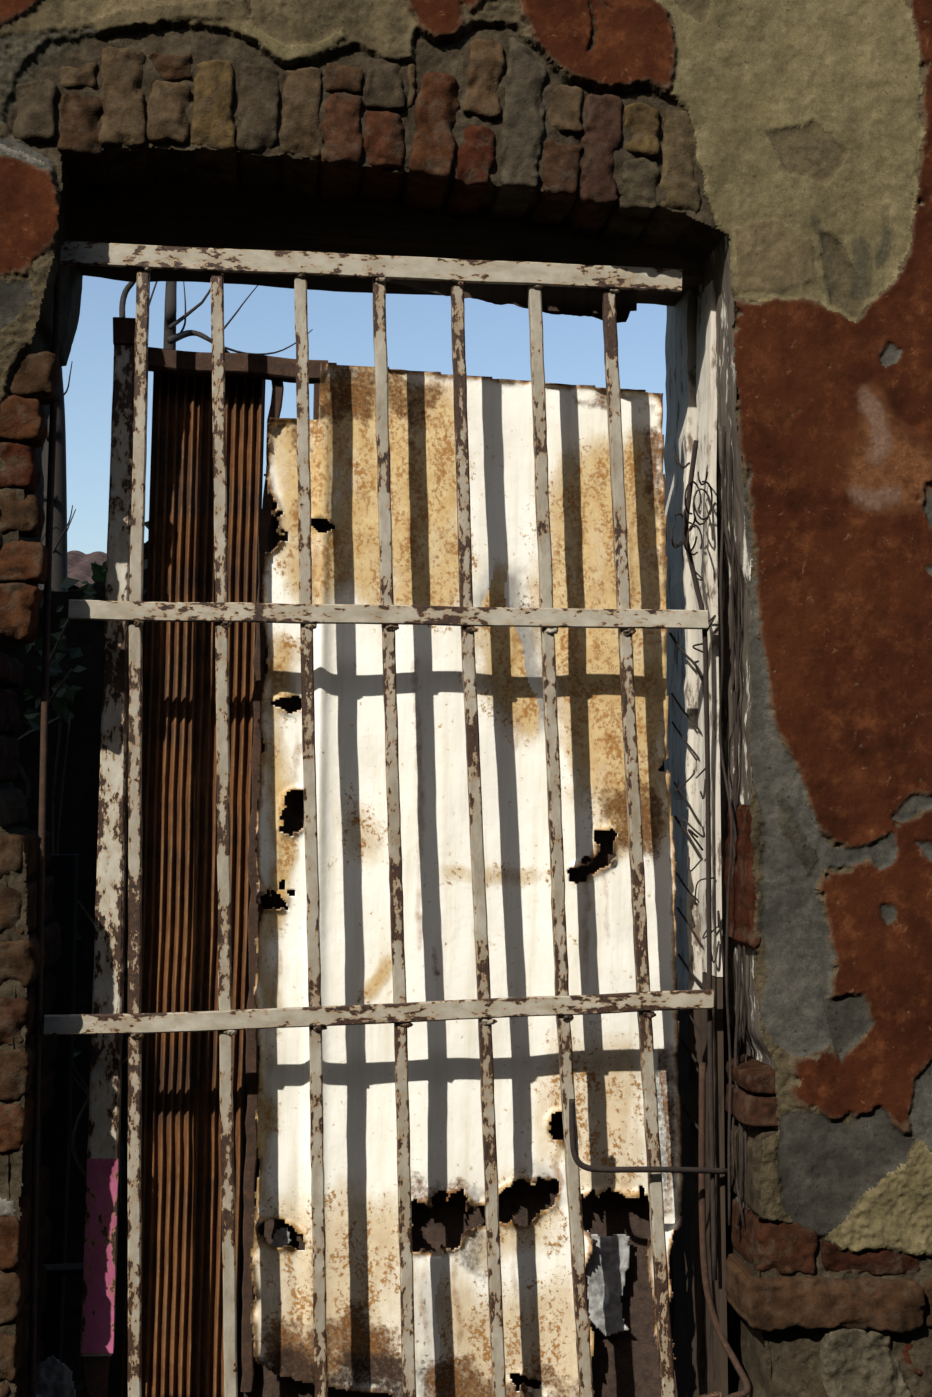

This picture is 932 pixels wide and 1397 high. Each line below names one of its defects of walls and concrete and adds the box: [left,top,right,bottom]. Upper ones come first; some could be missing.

spalling [0,0,926,323]
rust [271,367,477,606]
rust [480,428,667,610]
spalling [0,827,29,942]
rust [255,629,301,1006]
rust [477,627,539,746]
rust [555,628,670,862]
peeling [744,463,932,1063]
spalling [0,1145,23,1221]
rust [251,1079,422,1397]
peeling [753,1061,932,1289]
spalling [762,1327,827,1397]